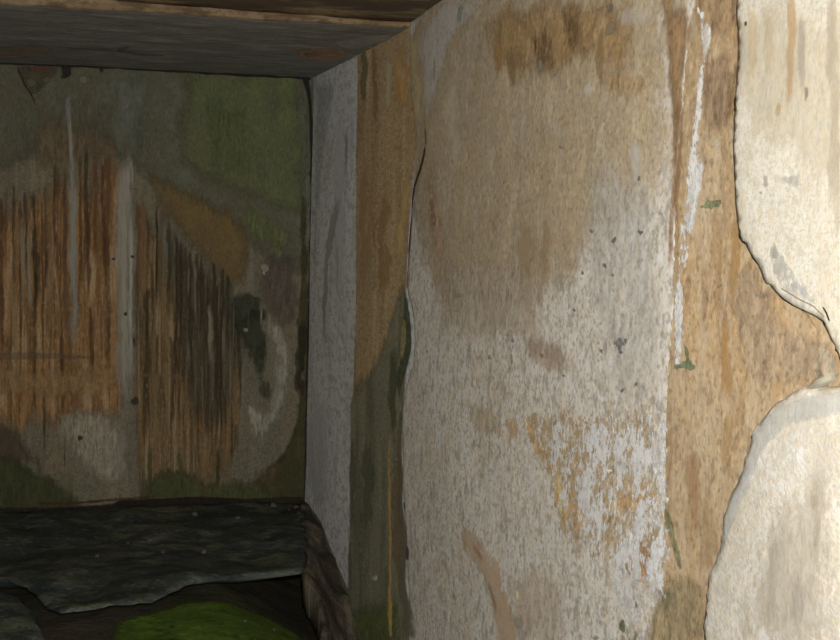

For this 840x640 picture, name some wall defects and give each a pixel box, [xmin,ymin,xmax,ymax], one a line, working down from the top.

leakage [0,64,332,428]
leakage [349,443,374,521]
leakage [388,354,413,635]
crack [407,131,426,285]
spalling [508,0,840,640]
leakage [674,7,711,370]